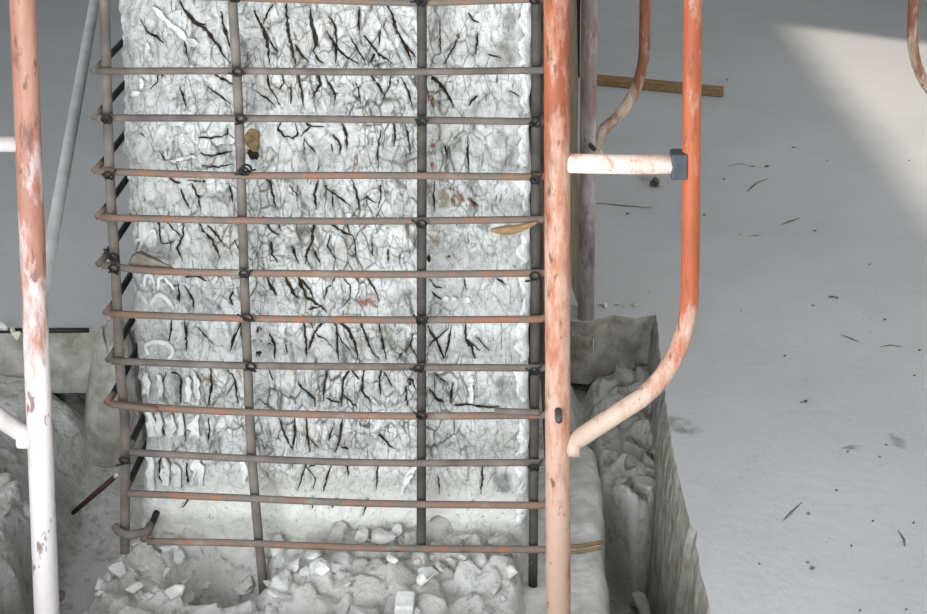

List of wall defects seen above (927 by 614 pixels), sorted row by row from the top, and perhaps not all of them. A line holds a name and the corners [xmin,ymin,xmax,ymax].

spalling [518,3,531,114]
spalling [245,128,260,160]
spalling [518,125,529,168]
spalling [515,180,530,213]
crack [140,1,500,509]
spalling [516,228,530,265]
spalling [514,277,530,403]
flaking render [185,374,201,403]
flaking render [145,412,201,439]
spalling [516,419,529,454]
flaking render [145,457,205,491]
spalling [513,466,528,525]